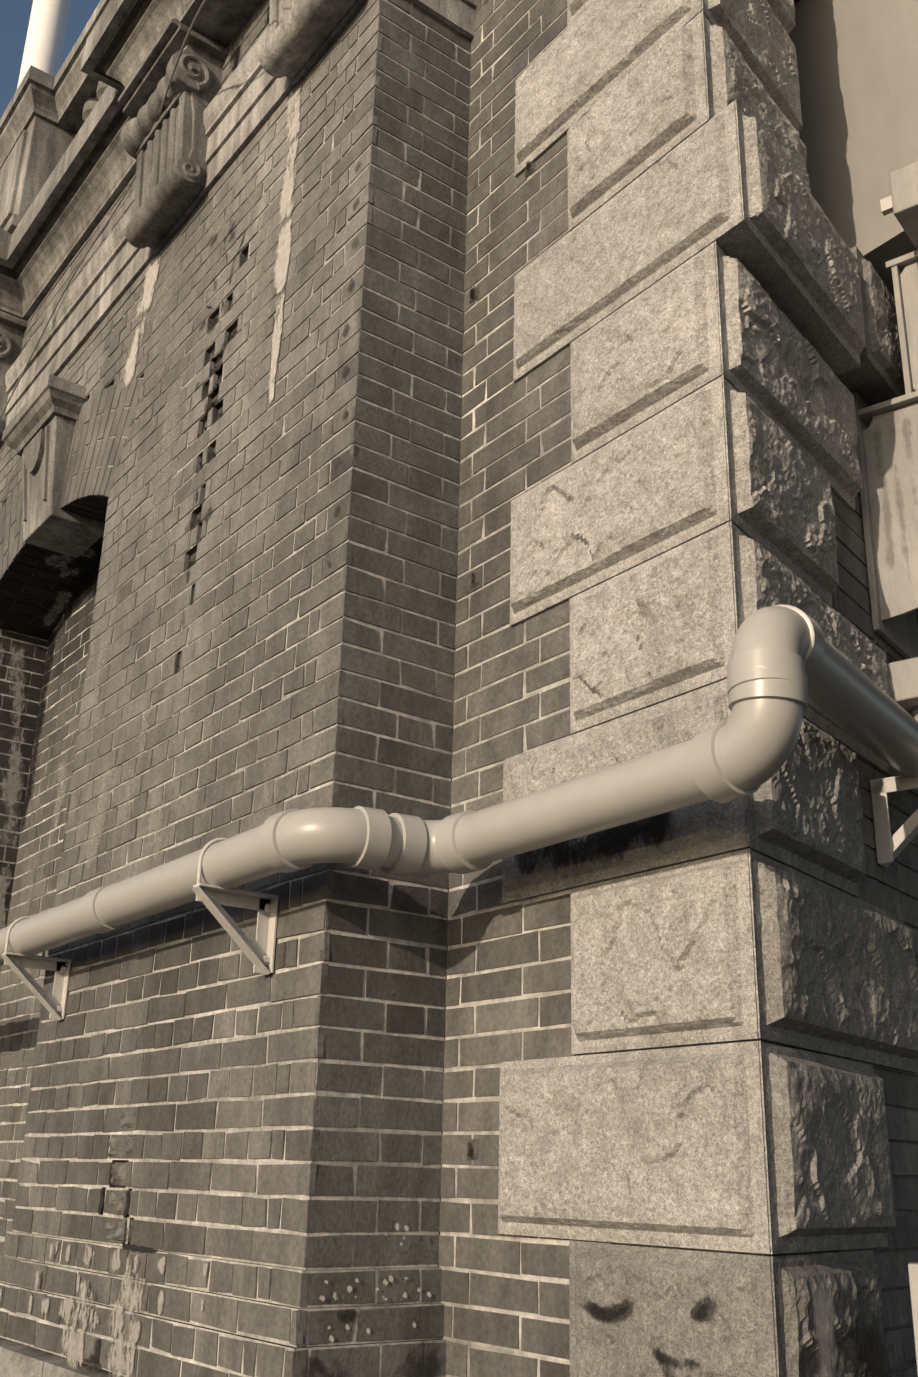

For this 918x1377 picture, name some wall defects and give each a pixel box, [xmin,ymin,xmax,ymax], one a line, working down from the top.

damp [122,250,161,386]
damp [269,89,300,403]
crack [174,209,248,667]
damp [0,633,55,843]
damp [0,863,10,929]
damp [28,1242,164,1377]